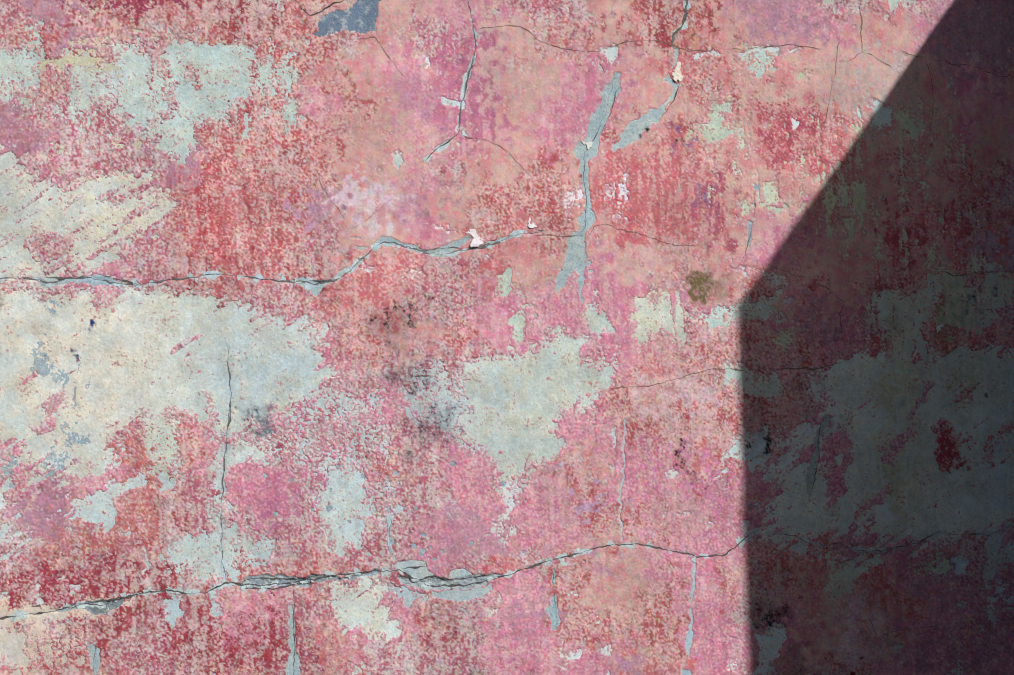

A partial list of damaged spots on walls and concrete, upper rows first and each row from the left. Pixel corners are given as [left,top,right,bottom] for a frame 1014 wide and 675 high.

peeling [0,6,629,675]
crack [0,76,696,291]
water stain [686,271,713,304]
peeling [612,33,1014,629]
crack [0,343,1012,675]
flaking render [685,561,696,655]
peeling [724,622,788,675]